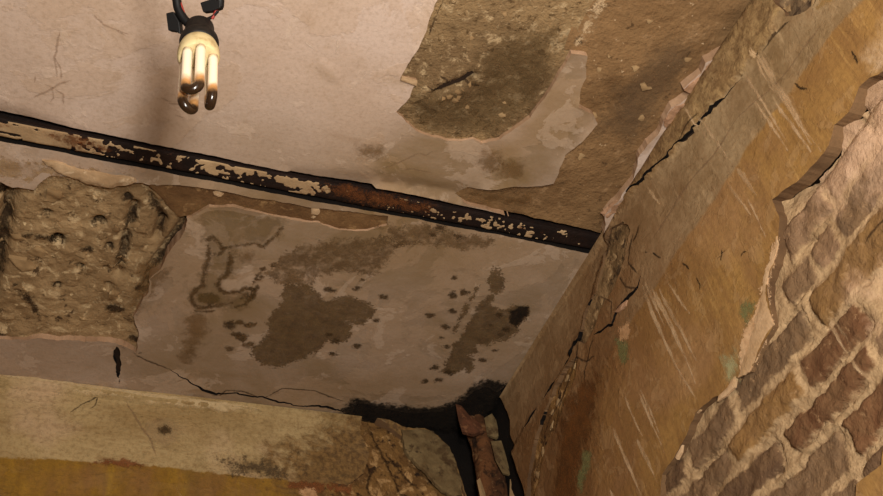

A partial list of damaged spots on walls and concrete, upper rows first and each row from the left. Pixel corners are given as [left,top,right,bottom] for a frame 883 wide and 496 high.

flaking render [779,0,816,16]
flaking render [0,0,750,384]
rust [321,184,431,212]
leakage [186,228,284,354]
crack [602,228,639,313]
flaking render [665,80,883,496]
peeling [0,375,255,411]
crack [114,347,165,382]
crack [543,340,593,445]
flaking render [299,421,446,496]